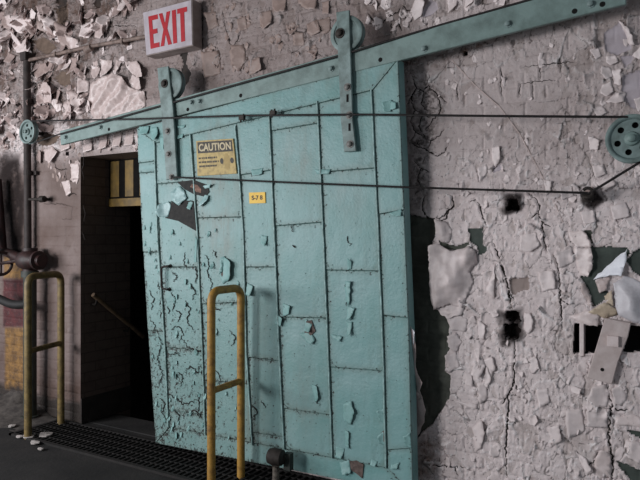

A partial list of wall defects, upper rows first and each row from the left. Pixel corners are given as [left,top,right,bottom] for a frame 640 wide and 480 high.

peeling [0,0,164,196]
peeling [364,0,440,31]
crack [409,75,458,221]
peeling [584,130,617,192]
peeling [590,21,640,115]
crack [149,250,221,420]
peeling [403,214,529,480]
crack [493,243,514,309]
crack [502,338,518,478]
peeling [523,312,547,334]
peeling [507,346,640,480]
peeling [538,186,640,326]